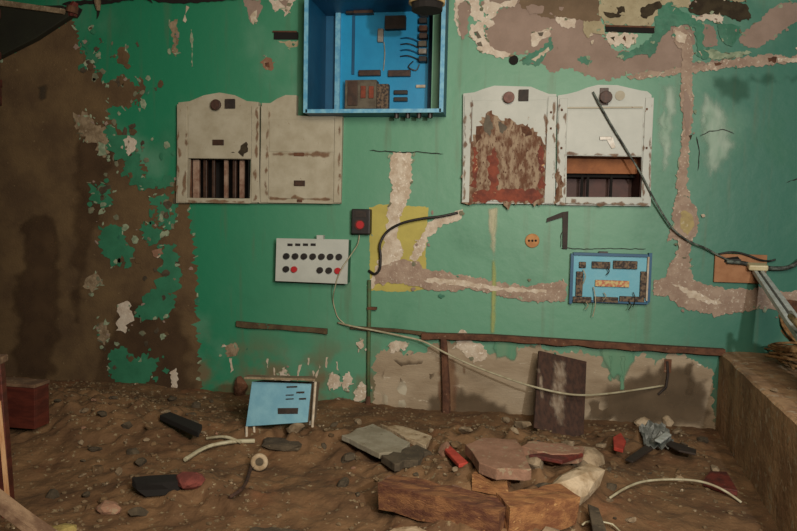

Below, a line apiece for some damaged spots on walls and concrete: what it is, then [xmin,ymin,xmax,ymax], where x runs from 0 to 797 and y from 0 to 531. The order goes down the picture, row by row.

peeling [168,6,194,66]
peeling [0,19,203,389]
flaking render [369,151,567,303]
peeling [454,0,797,318]
crack [696,129,732,168]
flaking render [266,329,716,429]